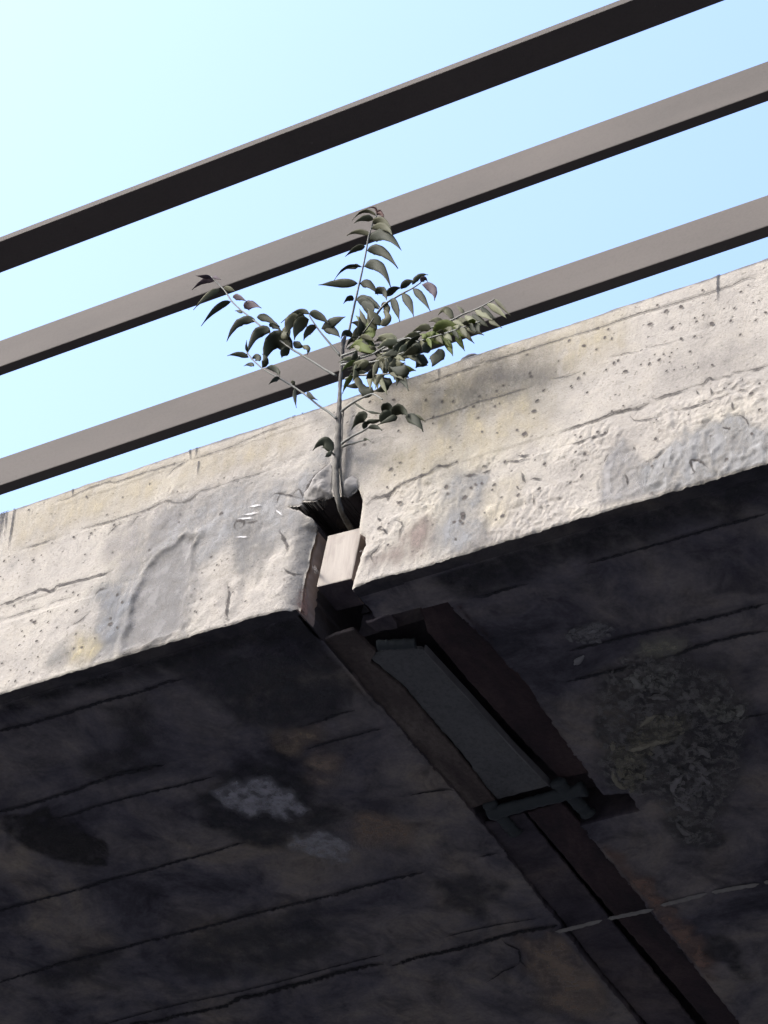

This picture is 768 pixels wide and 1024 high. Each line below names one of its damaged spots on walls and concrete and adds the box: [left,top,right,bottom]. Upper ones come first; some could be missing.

crack [569,366,765,484]
damp [5,809,106,866]
damp [201,766,349,861]
crack [130,926,555,1024]